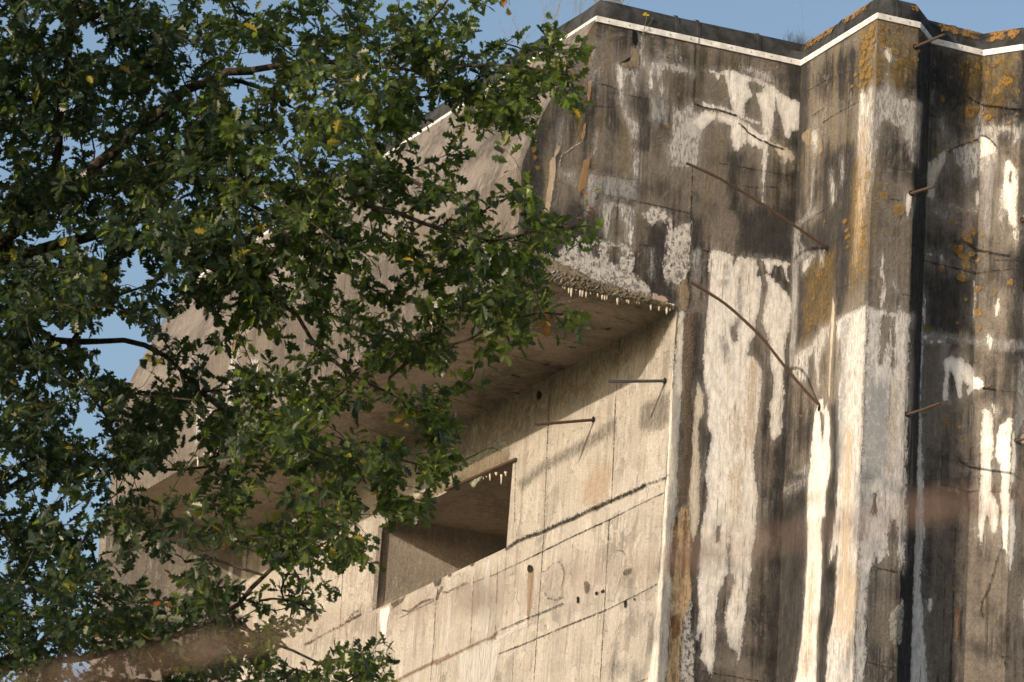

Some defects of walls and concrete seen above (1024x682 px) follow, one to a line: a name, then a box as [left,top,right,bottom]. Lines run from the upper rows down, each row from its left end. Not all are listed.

spalling [531,250,696,507]
damp [521,33,1024,682]
corrosion [666,507,692,682]